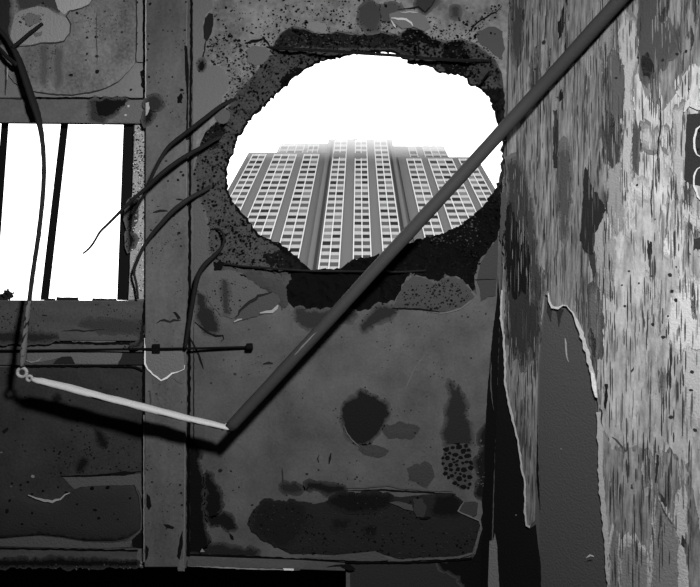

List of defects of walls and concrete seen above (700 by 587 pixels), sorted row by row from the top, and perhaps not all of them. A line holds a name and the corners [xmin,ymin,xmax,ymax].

crack [51,0,472,564]
spalling [193,0,447,321]
water stain [263,245,378,331]
water stain [328,0,700,587]
water stain [186,438,395,558]